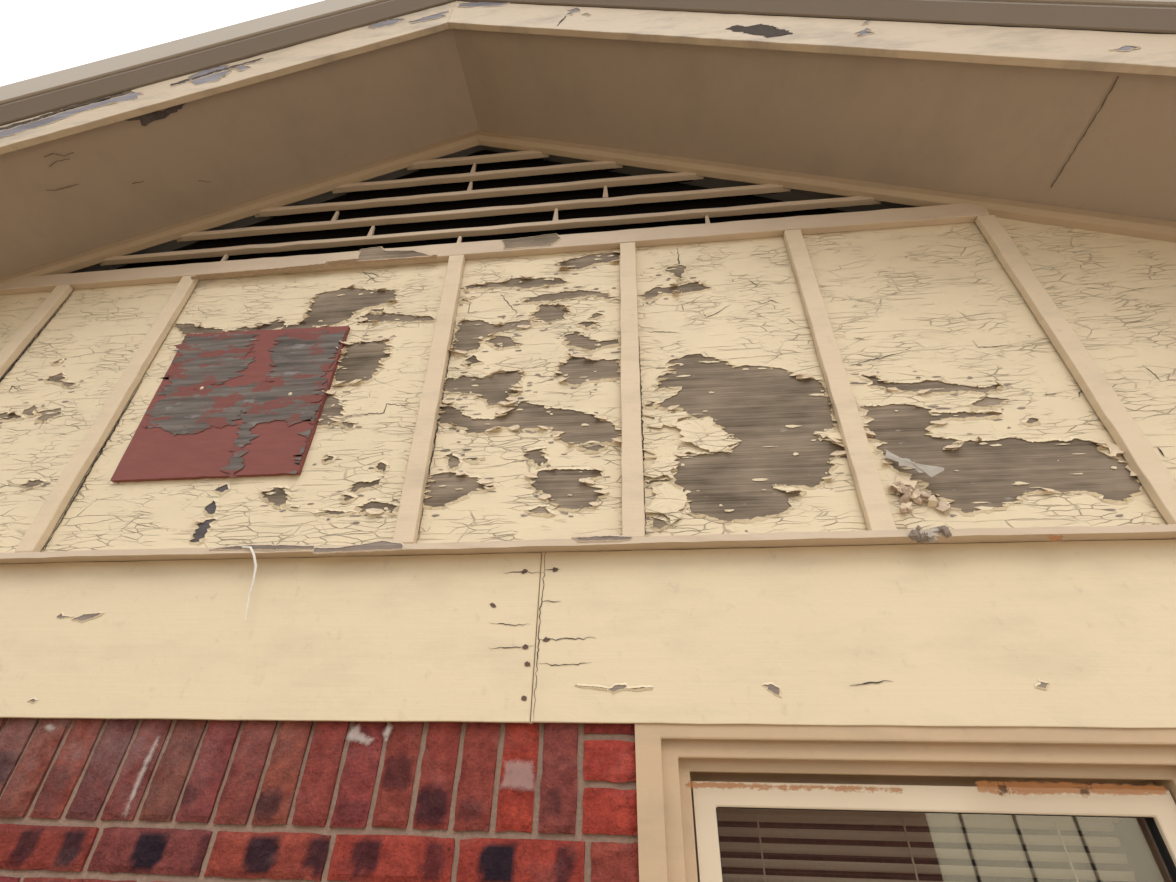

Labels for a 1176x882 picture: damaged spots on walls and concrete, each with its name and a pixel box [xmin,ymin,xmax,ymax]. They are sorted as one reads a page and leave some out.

peeling [726,24,793,37]
peeling [0,90,144,138]
crack [1050,76,1119,188]
crack [0,295,71,392]
crack [43,382,142,552]
peeling [143,284,437,524]
peeling [422,251,622,518]
peeling [638,263,713,304]
peeling [642,353,847,534]
peeling [850,364,1144,517]
peeling [209,540,405,554]
crack [490,552,594,714]